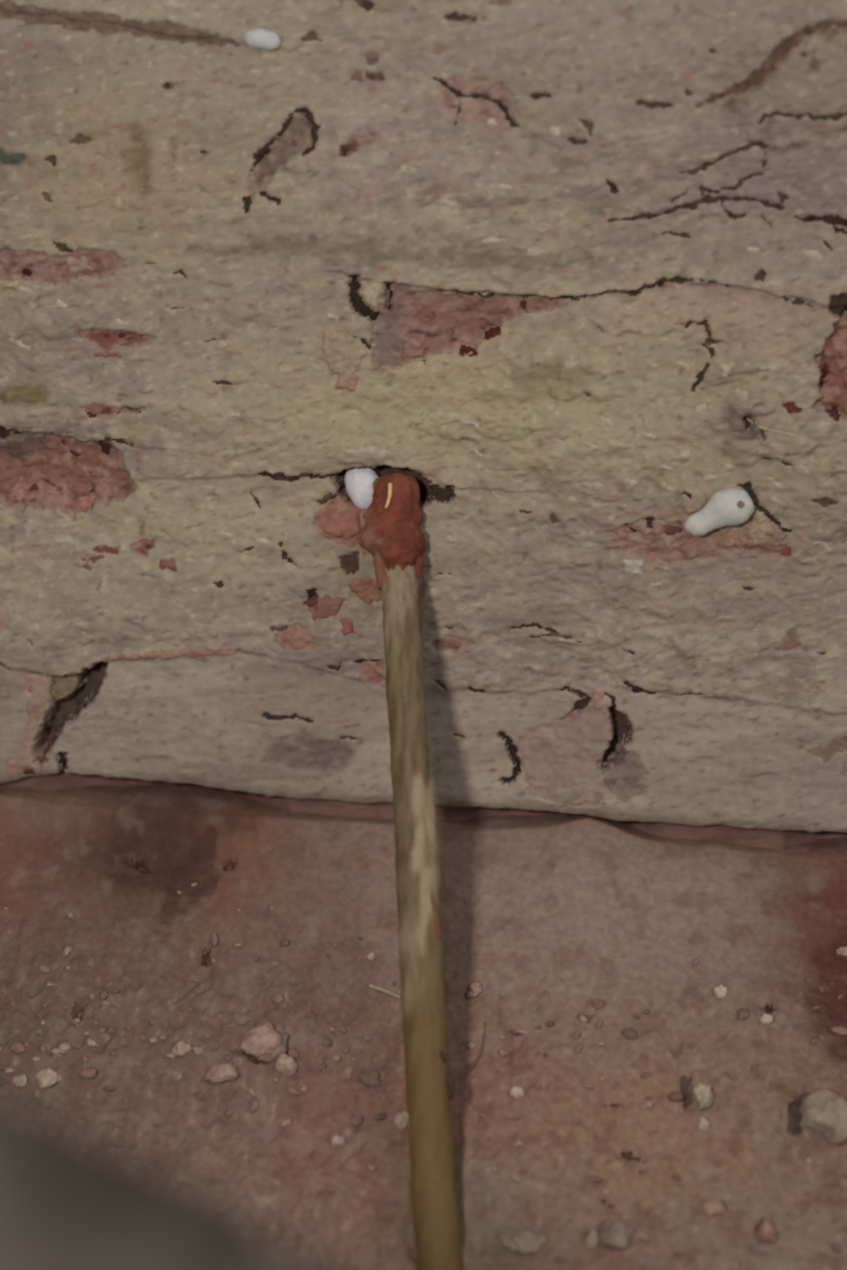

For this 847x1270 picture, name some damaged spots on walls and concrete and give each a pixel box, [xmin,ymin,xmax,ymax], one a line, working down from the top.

spalling [242,107,321,214]
crack [607,19,847,238]
spalling [321,274,586,391]
crack [439,275,731,301]
crack [677,319,723,394]
crack [781,296,814,307]
spalling [781,293,847,431]
spalling [0,426,137,518]
crack [250,470,338,509]
crack [242,542,298,567]
spalling [269,446,456,652]
spalling [517,688,615,806]